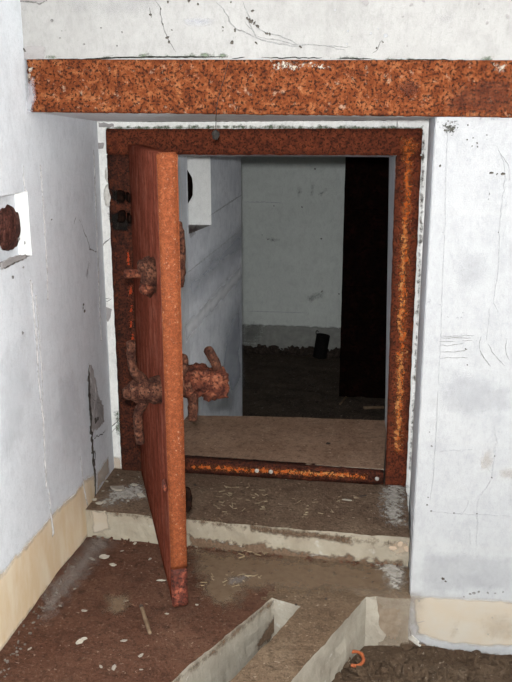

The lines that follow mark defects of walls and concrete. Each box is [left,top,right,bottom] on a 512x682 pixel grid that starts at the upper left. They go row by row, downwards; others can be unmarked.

crack [149,3,176,52]
crack [215,1,347,50]
corrosion [393,137,417,454]
spalling [87,363,104,432]
crack [90,419,119,496]
corrosion [191,464,365,480]